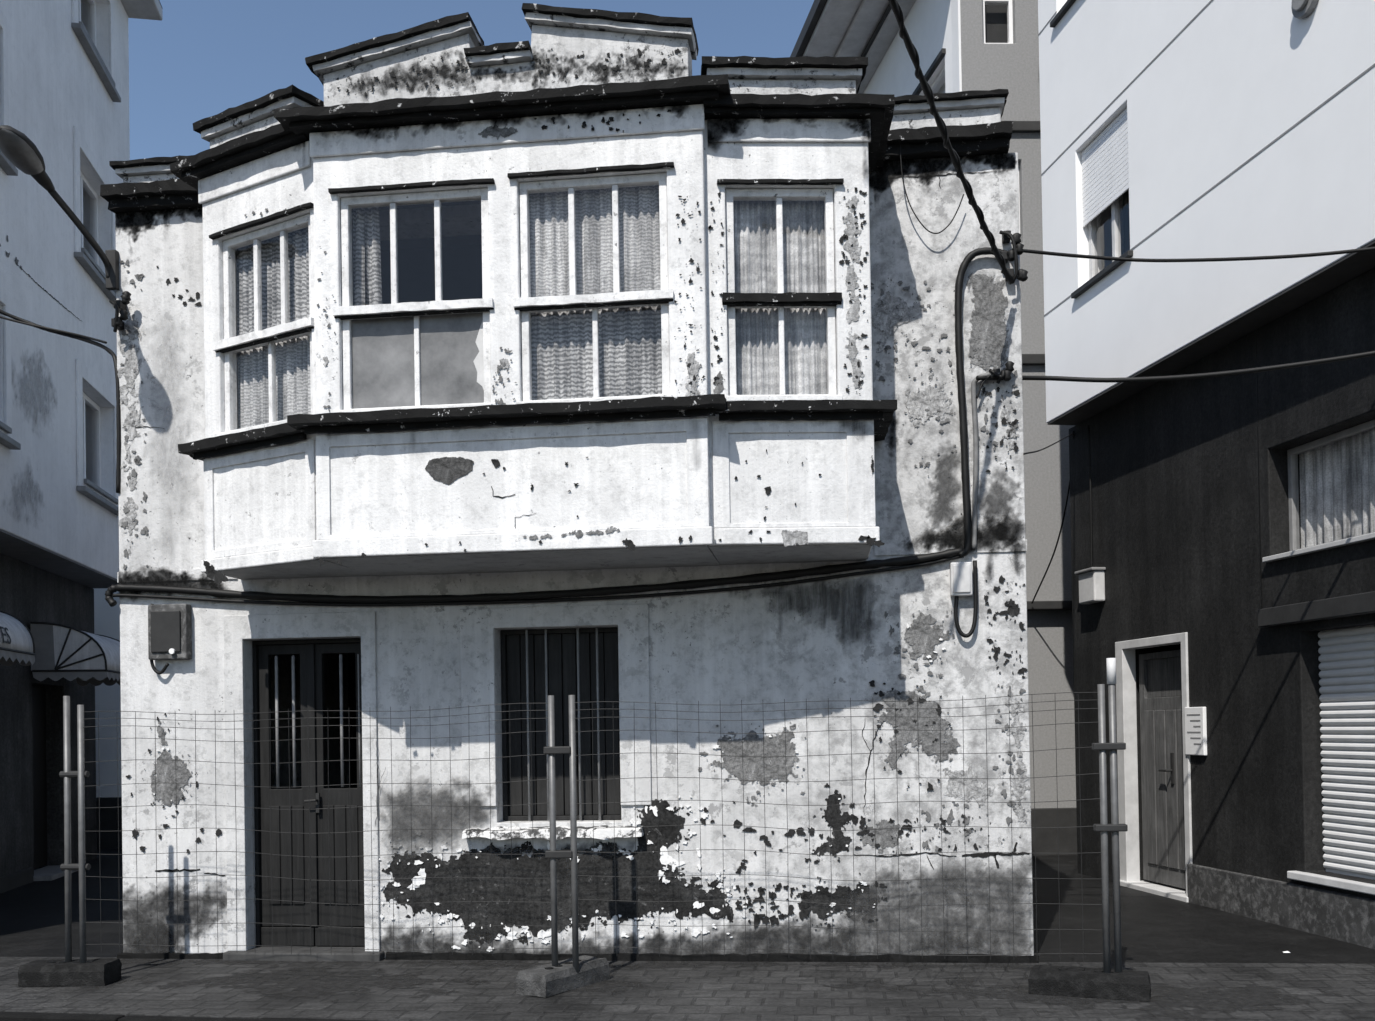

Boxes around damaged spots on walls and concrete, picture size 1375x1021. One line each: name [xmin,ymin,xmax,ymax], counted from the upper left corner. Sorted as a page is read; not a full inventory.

damp [846,118,872,140]
damp [863,153,1016,200]
damp [115,208,203,242]
peeling [839,187,955,443]
flaking render [966,273,1020,472]
spalling [425,457,506,484]
damp [888,416,897,456]
damp [907,453,1025,574]
flaking render [126,713,198,852]
damp [381,779,493,858]
flaking render [379,575,1031,952]
damp [122,886,227,954]